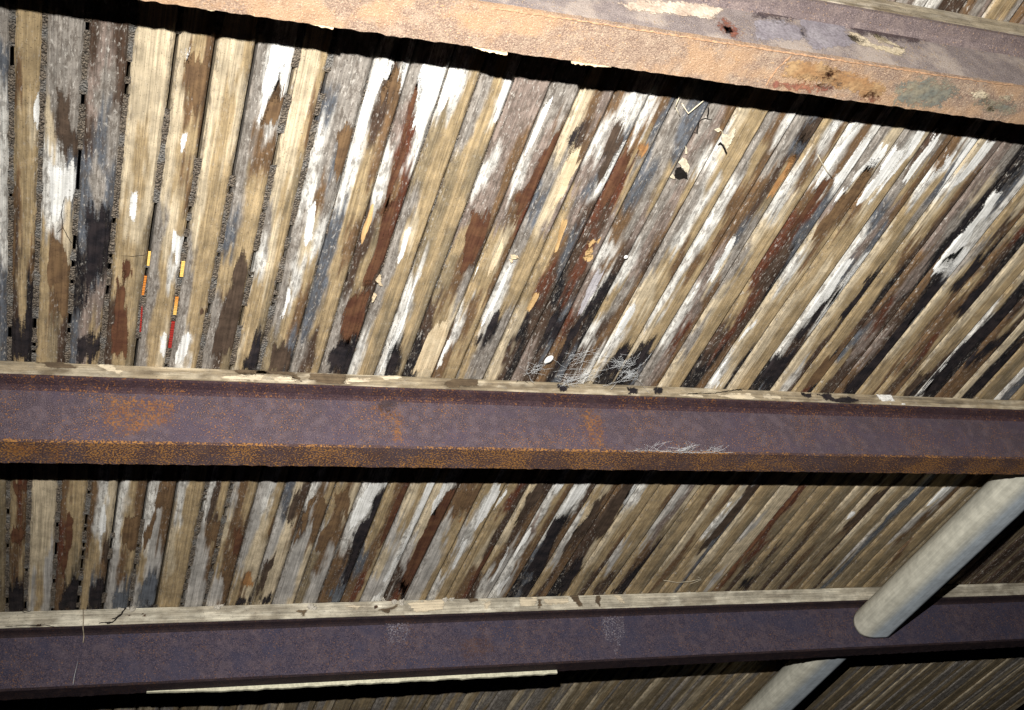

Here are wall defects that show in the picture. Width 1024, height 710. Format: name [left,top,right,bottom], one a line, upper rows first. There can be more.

corrosion [491,8,1012,103]
corrosion [100,394,182,437]